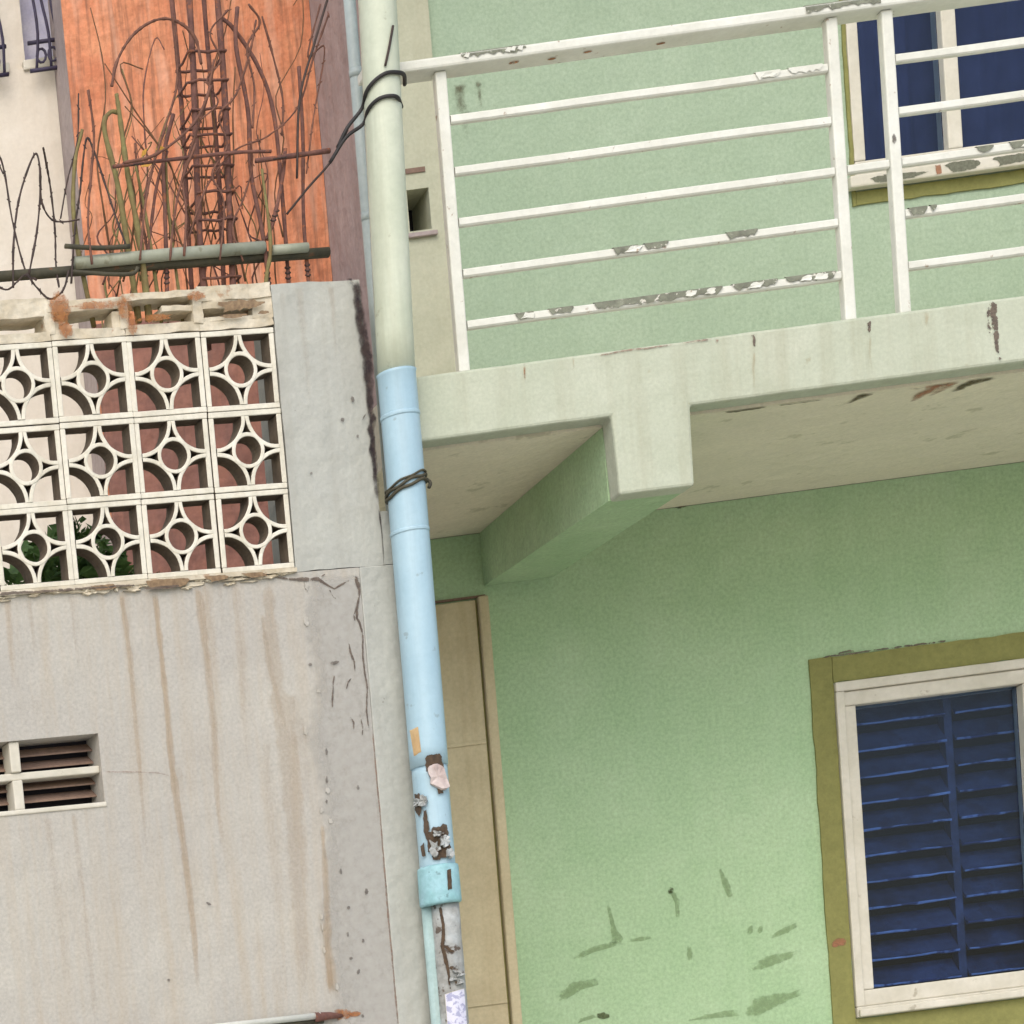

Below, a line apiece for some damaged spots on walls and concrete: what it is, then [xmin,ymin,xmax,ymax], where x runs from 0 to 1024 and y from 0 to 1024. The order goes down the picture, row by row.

peeling [460,44,526,58]
peeling [902,140,1024,179]
peeling [724,228,758,239]
peeling [612,240,669,255]
rust [187,291,205,301]
peeling [593,270,836,309]
rust [49,291,170,338]
peeling [514,311,535,320]
peeling [547,306,574,314]
spalling [0,572,294,602]
crack [277,574,398,1016]
rust [336,1009,361,1020]